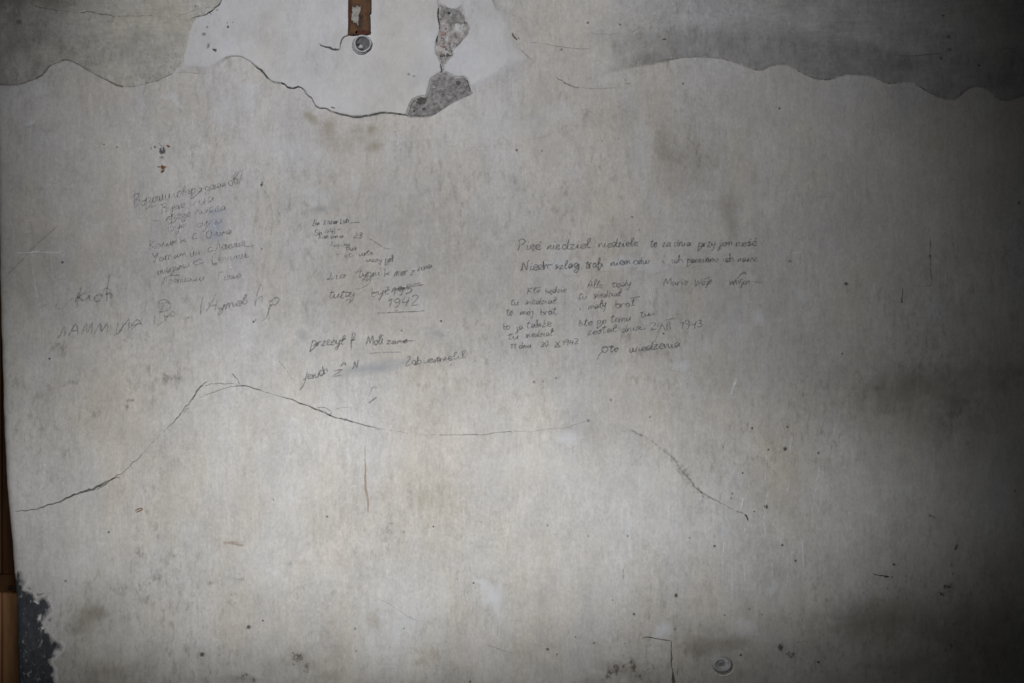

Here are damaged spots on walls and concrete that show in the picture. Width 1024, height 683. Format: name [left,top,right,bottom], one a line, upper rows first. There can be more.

flaking render [406,3,473,117]
crack [292,399,368,426]
crack [23,478,114,511]
peeling [15,560,66,683]